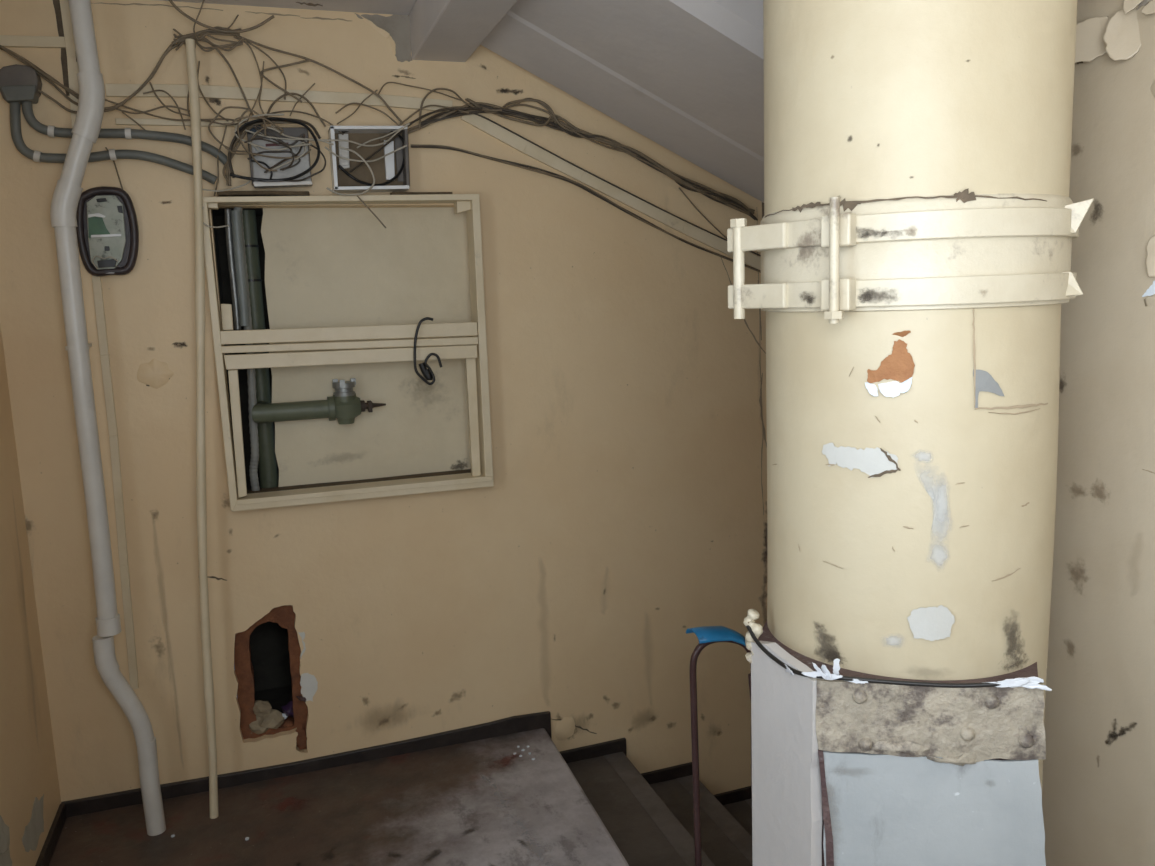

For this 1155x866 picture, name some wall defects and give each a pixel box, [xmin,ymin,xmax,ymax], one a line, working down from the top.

spalling [355,13,412,62]
peeling [1075,0,1155,64]
peeling [1142,236,1155,306]
crack [721,252,777,515]
peeling [865,331,915,398]
peeling [822,443,901,478]
peeling [907,605,955,641]
spalling [234,605,318,750]
peeling [0,794,44,866]